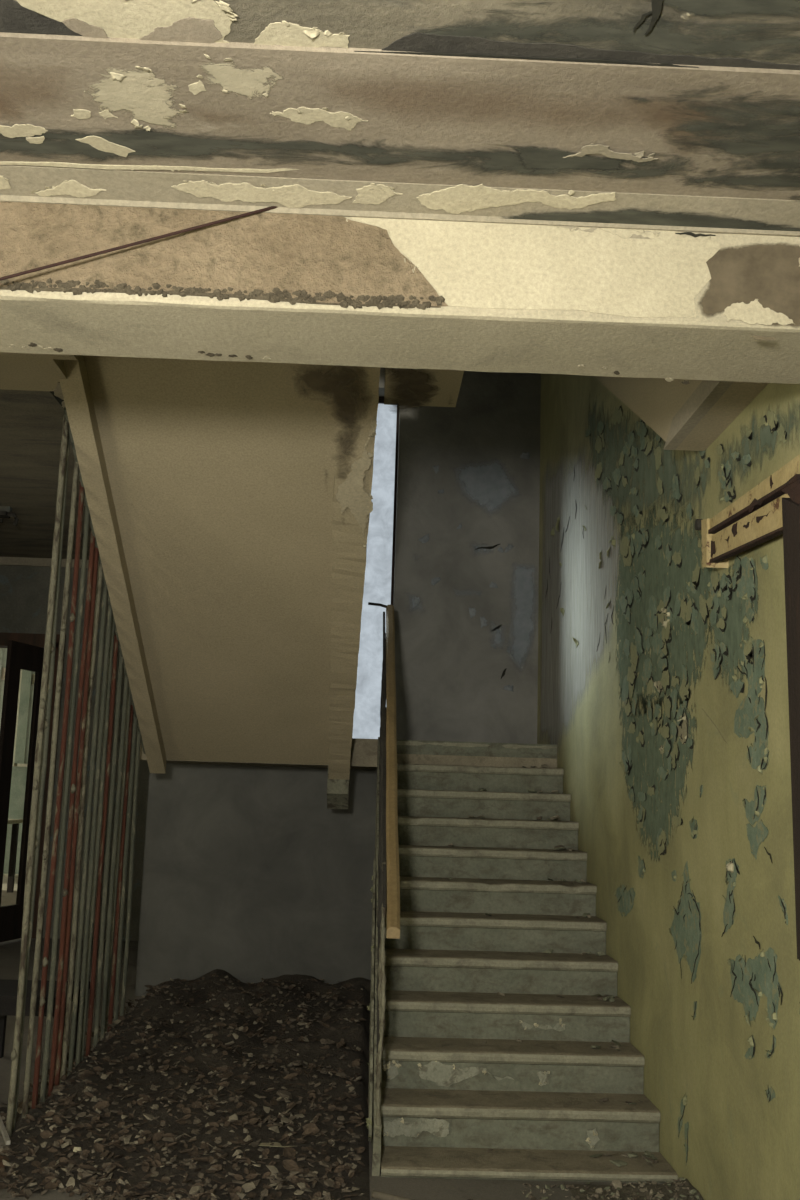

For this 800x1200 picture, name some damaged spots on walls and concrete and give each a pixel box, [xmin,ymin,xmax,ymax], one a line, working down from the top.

peeling [0,0,368,131]
crack [354,0,699,68]
peeling [0,124,48,144]
flaking render [0,136,721,318]
peeling [723,299,794,326]
water stain [297,367,369,458]
peeling [716,405,800,503]
peeling [669,862,702,984]
peeling [721,858,740,937]
peeling [727,936,783,1060]